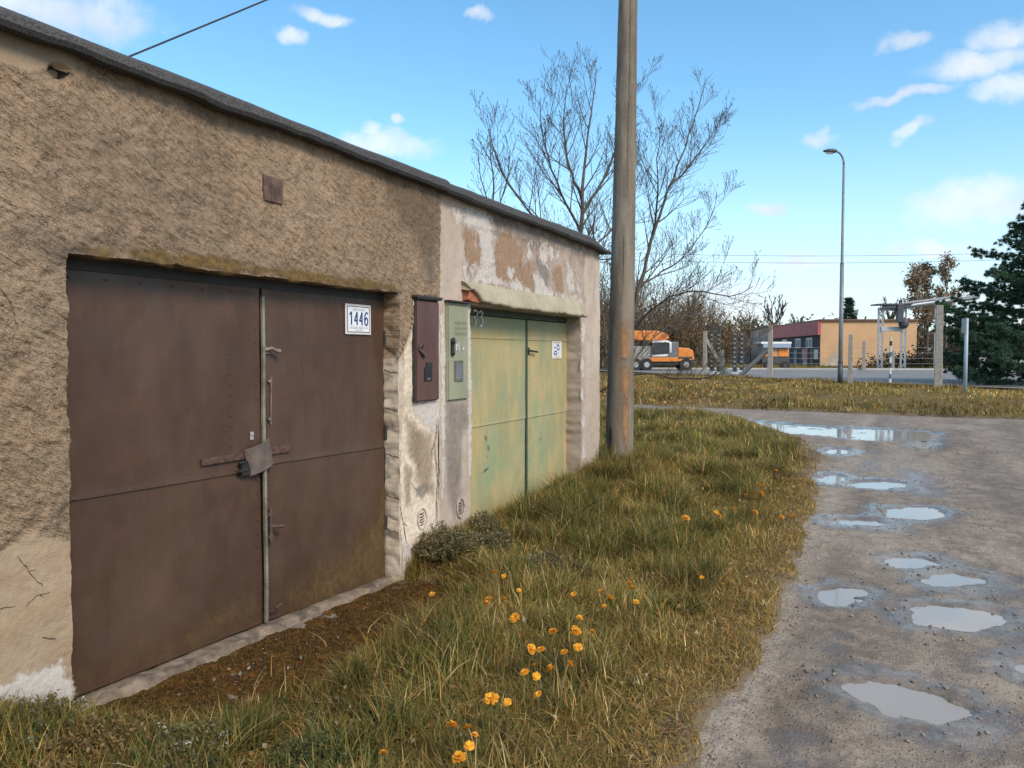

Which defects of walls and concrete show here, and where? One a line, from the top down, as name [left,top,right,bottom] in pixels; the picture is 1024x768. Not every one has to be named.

flaking render [452,204,584,477]
crack [1,557,50,609]